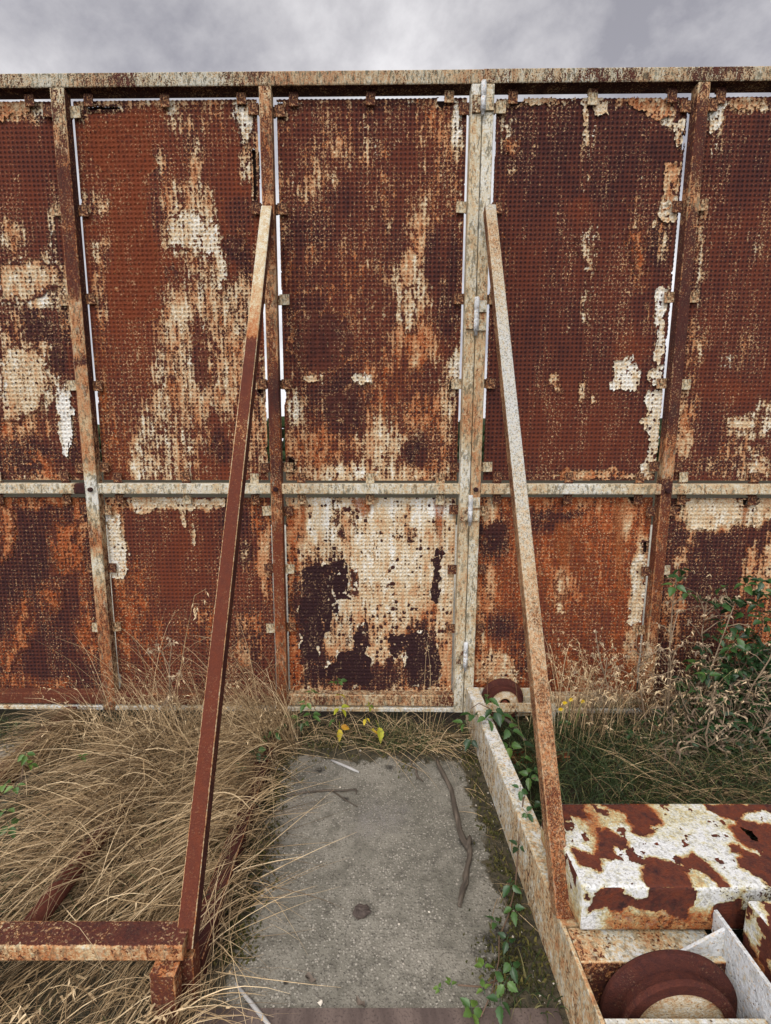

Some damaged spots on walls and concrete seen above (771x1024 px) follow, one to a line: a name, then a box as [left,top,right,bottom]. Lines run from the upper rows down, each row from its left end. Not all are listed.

peeling [164,208,231,294]
rust [188,318,214,390]
rust [285,310,355,375]
rust [323,381,373,429]
peeling [546,285,670,481]
rust [17,455,44,478]
rust [69,437,78,466]
rust [481,519,510,554]